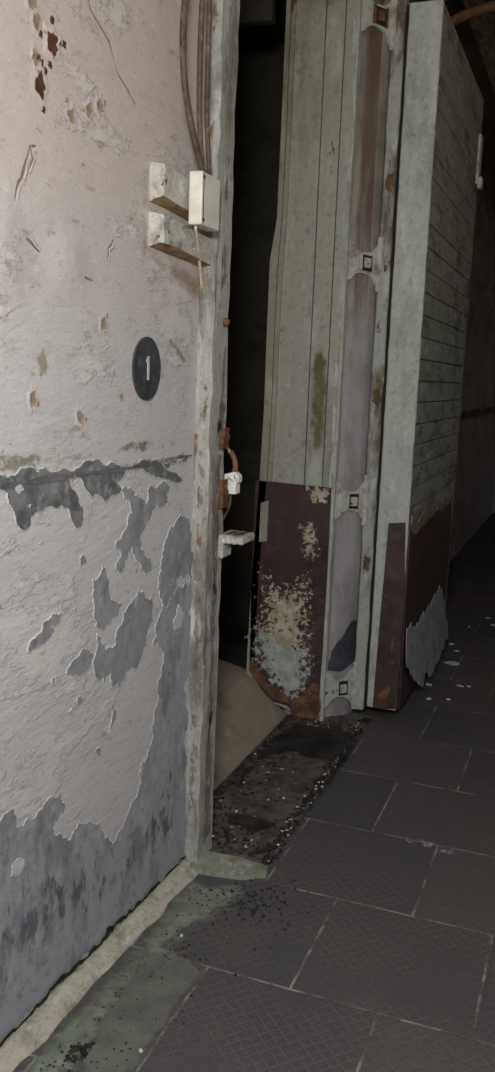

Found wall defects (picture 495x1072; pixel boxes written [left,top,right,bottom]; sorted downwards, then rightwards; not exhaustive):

flaking render [24,0,66,115]
flaking render [63,90,106,132]
crack [88,0,136,103]
peeling [247,520,357,696]
peeling [0,347,229,1043]
rust [249,660,321,720]